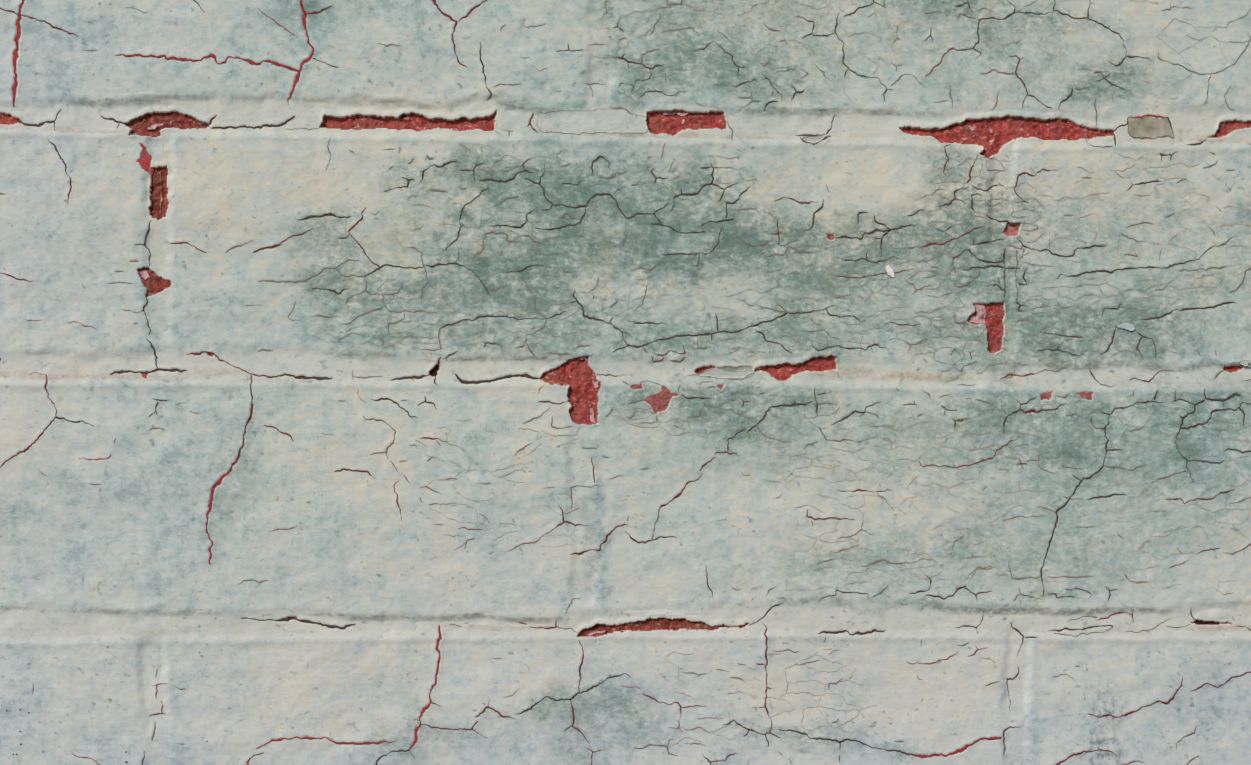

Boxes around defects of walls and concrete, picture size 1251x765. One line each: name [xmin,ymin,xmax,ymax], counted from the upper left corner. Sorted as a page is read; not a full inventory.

peeling [125,112,208,220]
crack [0,0,355,204]
peeling [321,113,496,131]
water stain [457,157,595,247]
peeling [901,116,1113,157]
crack [0,372,116,485]
crack [106,222,332,564]
peeling [540,356,601,425]
peeling [695,356,836,389]
crack [246,579,1021,765]
peeling [578,618,748,637]
crack [1055,666,1251,718]